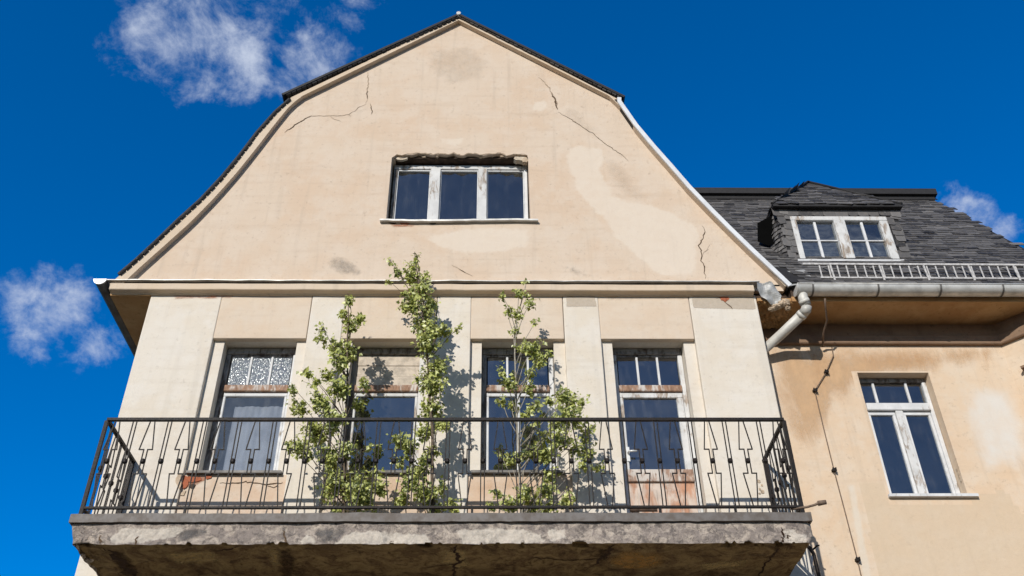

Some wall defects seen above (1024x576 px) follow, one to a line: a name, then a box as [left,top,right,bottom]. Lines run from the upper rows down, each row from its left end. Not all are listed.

crack [284,71,373,133]
crack [528,78,621,154]
crack [698,229,732,308]